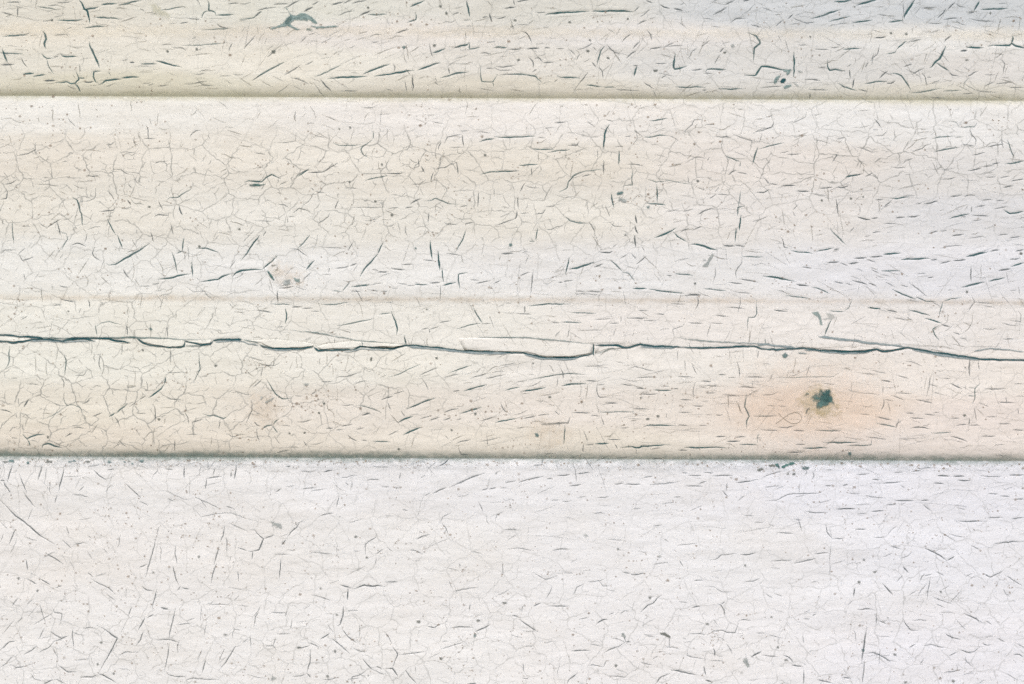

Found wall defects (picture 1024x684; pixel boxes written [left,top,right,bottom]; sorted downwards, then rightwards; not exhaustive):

crack [2,0,180,91]
crack [165,1,423,45]
crack [235,0,1024,98]
crack [41,172,275,284]
crack [246,118,1023,339]
crack [1,358,176,584]
crack [212,527,297,577]
crack [307,364,1018,498]
crack [714,470,1016,563]
crack [5,546,235,683]
crack [302,581,419,681]
crack [657,605,745,682]